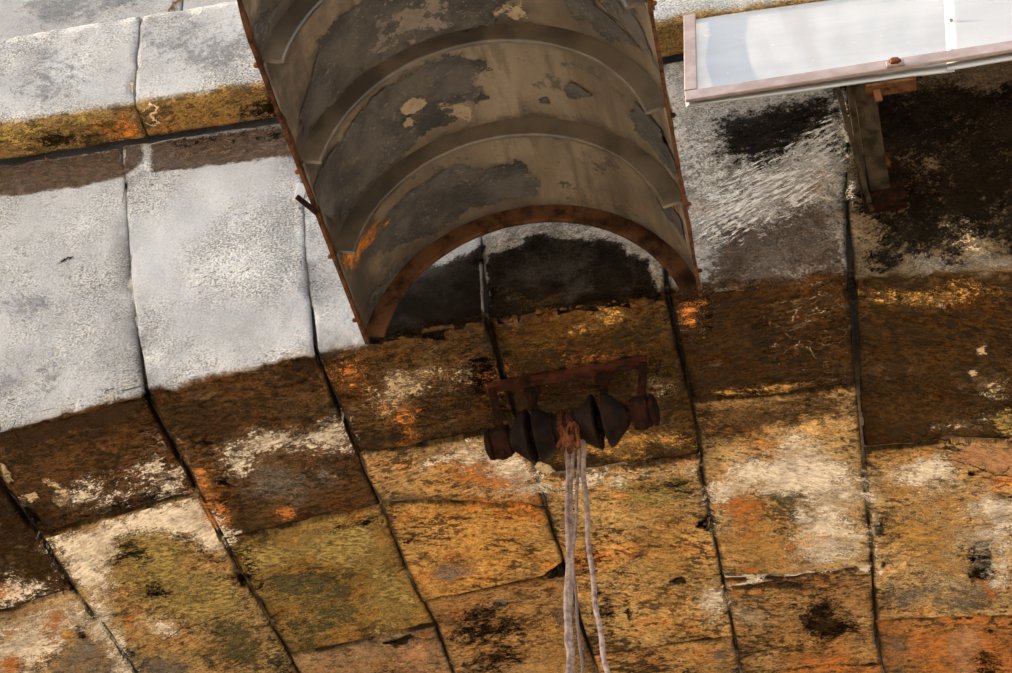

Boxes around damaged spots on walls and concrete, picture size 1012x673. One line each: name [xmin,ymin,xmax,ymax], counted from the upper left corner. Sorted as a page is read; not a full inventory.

peeling [314,53,493,221]
peeling [296,0,528,137]
peeling [359,159,542,319]
peeling [624,104,676,175]
peeling [656,196,685,239]
leakage [692,71,1012,294]
leakage [166,361,351,476]
leakage [361,233,1012,650]
leakage [0,461,267,673]
leakage [302,513,384,534]
leakage [365,594,586,673]
leakage [943,618,1008,673]